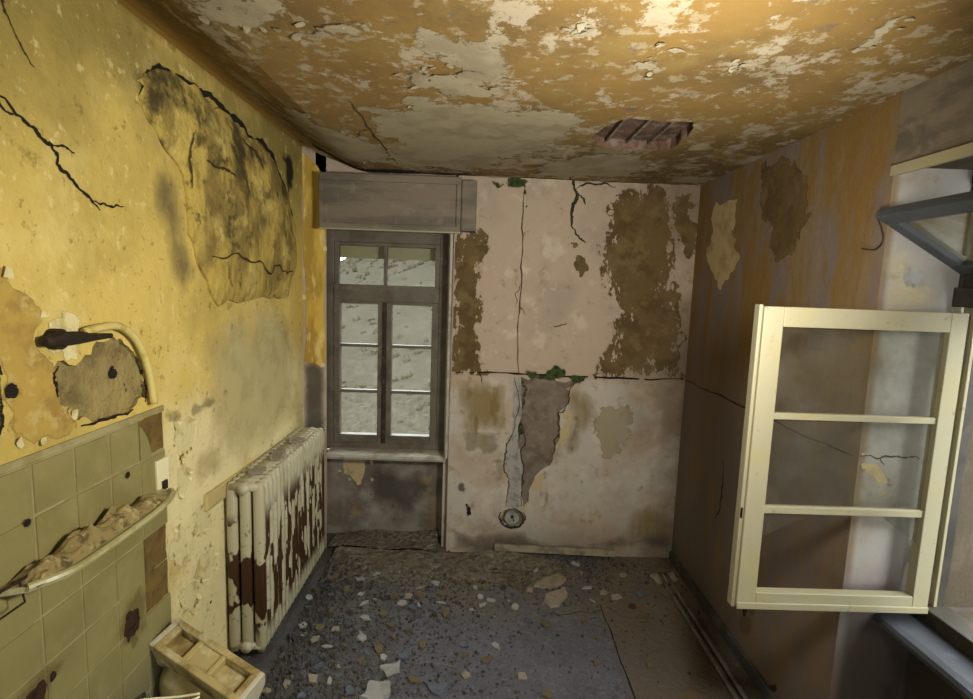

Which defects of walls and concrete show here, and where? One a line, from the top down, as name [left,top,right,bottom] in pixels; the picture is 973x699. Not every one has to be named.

peeling [184,0,370,42]
peeling [851,18,915,53]
crack [0,95,124,210]
peeling [273,27,586,170]
flaking render [593,118,695,151]
peeling [760,156,811,263]
peeling [0,266,198,499]
peeling [449,228,490,375]
crack [456,176,745,506]
peeling [517,183,740,507]
corrosion [124,608,140,643]
corrosion [26,671,57,699]